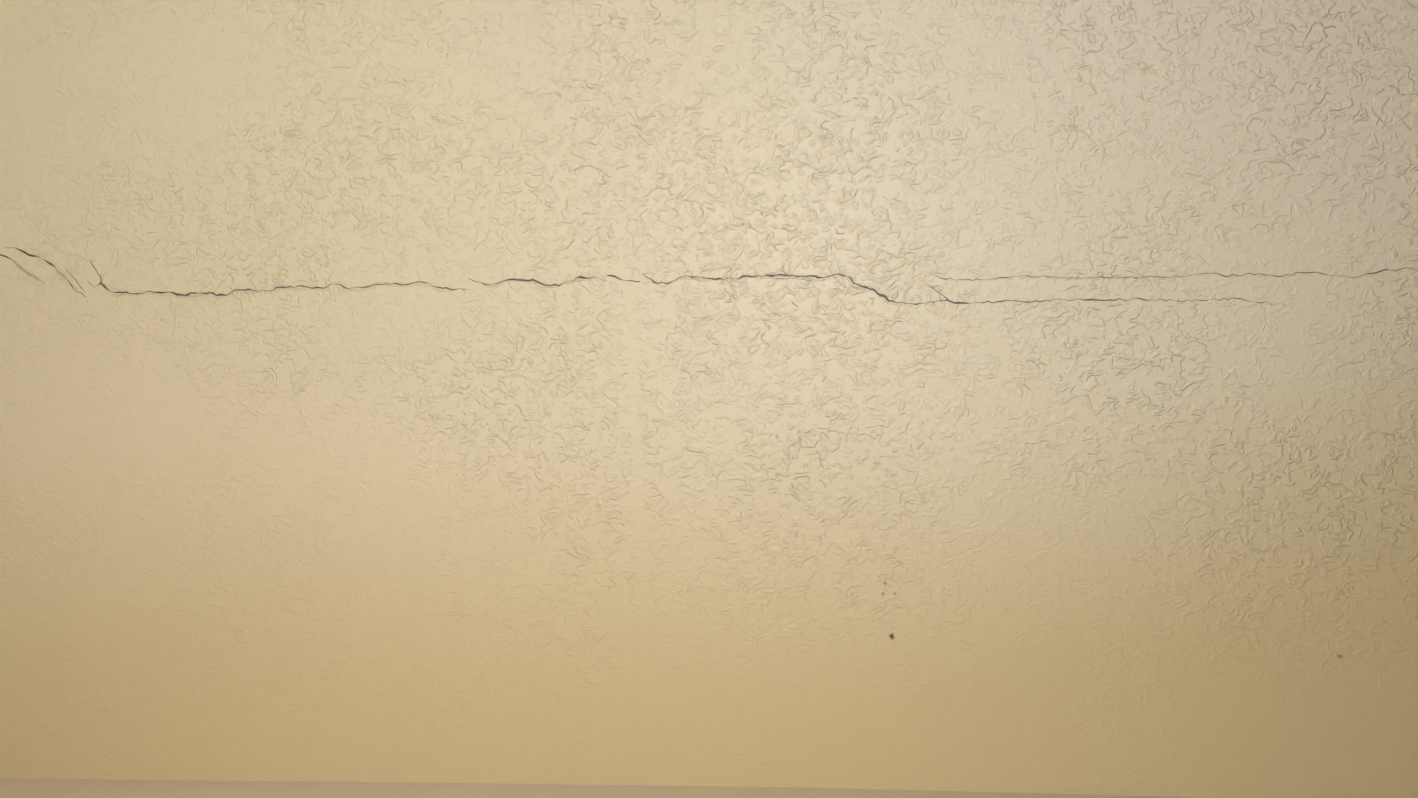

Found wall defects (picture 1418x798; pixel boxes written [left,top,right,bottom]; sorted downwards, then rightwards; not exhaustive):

crack [0,247,1417,305]